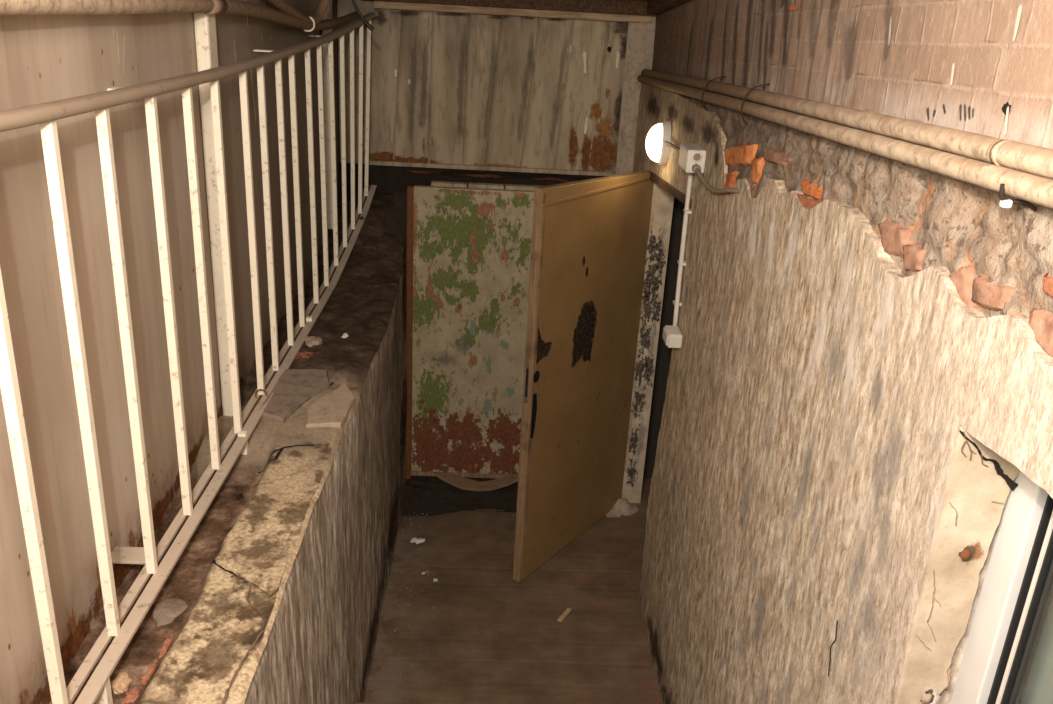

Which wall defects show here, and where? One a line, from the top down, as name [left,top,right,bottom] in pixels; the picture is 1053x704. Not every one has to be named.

damp [705,0,788,88]
damp [1013,5,1022,42]
corrosion [369,139,574,183]
corrosion [569,89,618,171]
spalling [678,91,1053,358]
peeling [413,188,533,374]
crack [258,444,314,473]